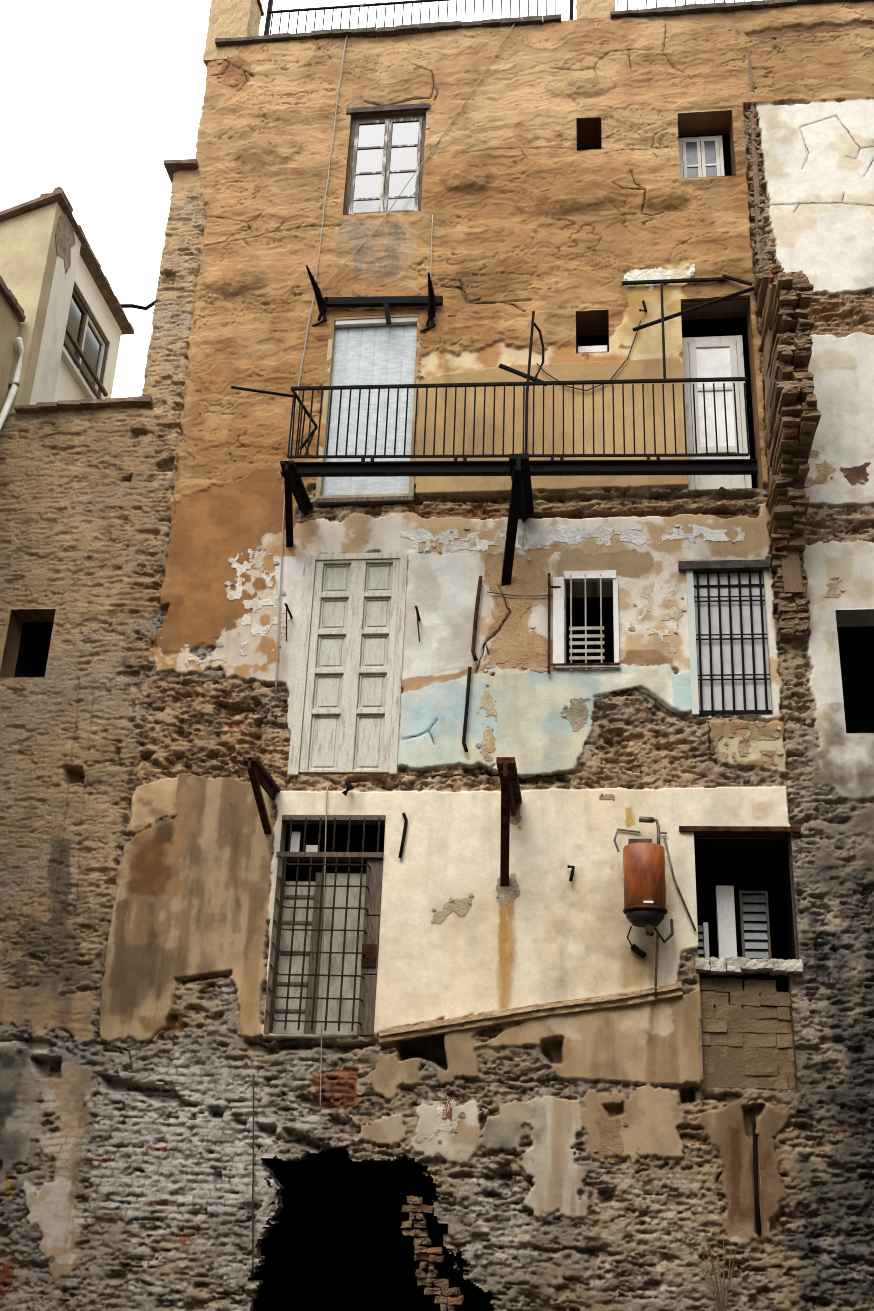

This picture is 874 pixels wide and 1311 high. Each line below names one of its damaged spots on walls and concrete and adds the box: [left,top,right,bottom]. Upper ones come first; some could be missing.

crack [775,115,874,212]
flaking render [621,264,695,292]
flaking render [804,450,871,488]
spalling [141,547,291,776]
crack [477,588,511,669]
peeling [400,522,745,761]
spalling [560,690,783,800]
damp [14,839,87,983]
damp [109,900,173,1009]
rust [499,901,513,1008]
damp [0,1039,33,1068]
damp [0,1090,17,1158]